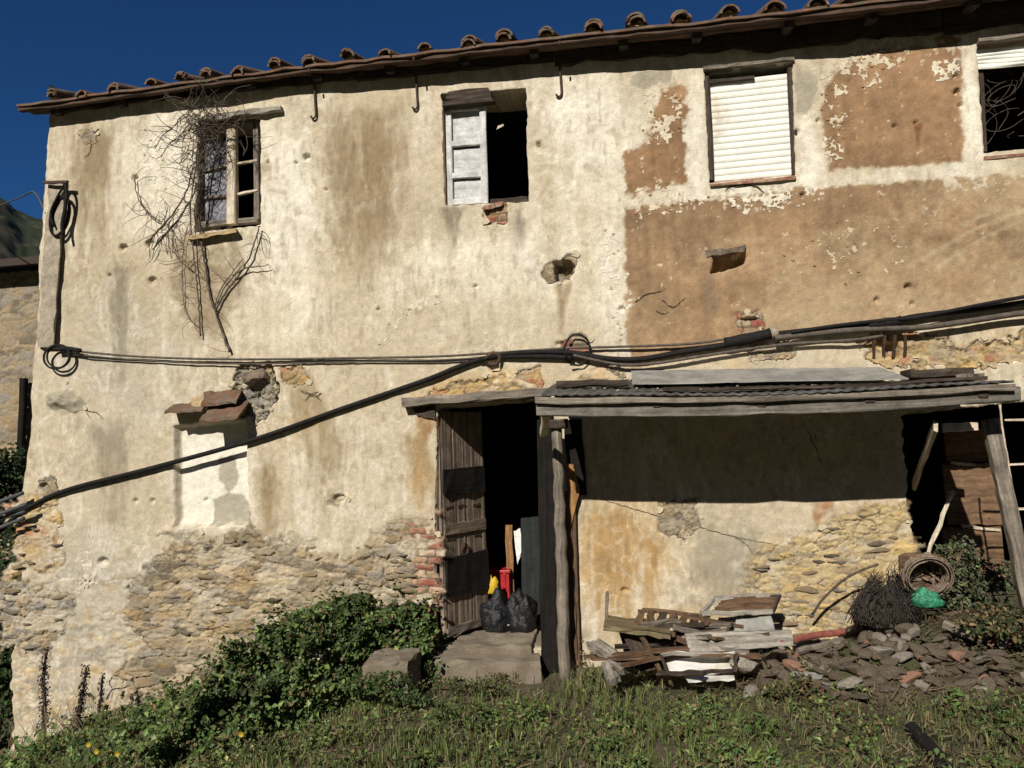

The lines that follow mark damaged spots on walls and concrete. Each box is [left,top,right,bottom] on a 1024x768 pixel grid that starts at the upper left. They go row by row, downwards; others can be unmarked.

peeling [818,46,910,162]
flaking render [481,202,508,225]
peeling [632,182,810,222]
flaking render [541,250,580,285]
crack [635,291,684,314]
flaking render [736,308,797,364]
flaking render [857,329,1024,370]
flaking render [164,360,312,426]
flaking render [656,498,704,541]
flaking render [0,476,99,655]
flaking render [743,501,924,640]
flaking render [112,509,446,705]